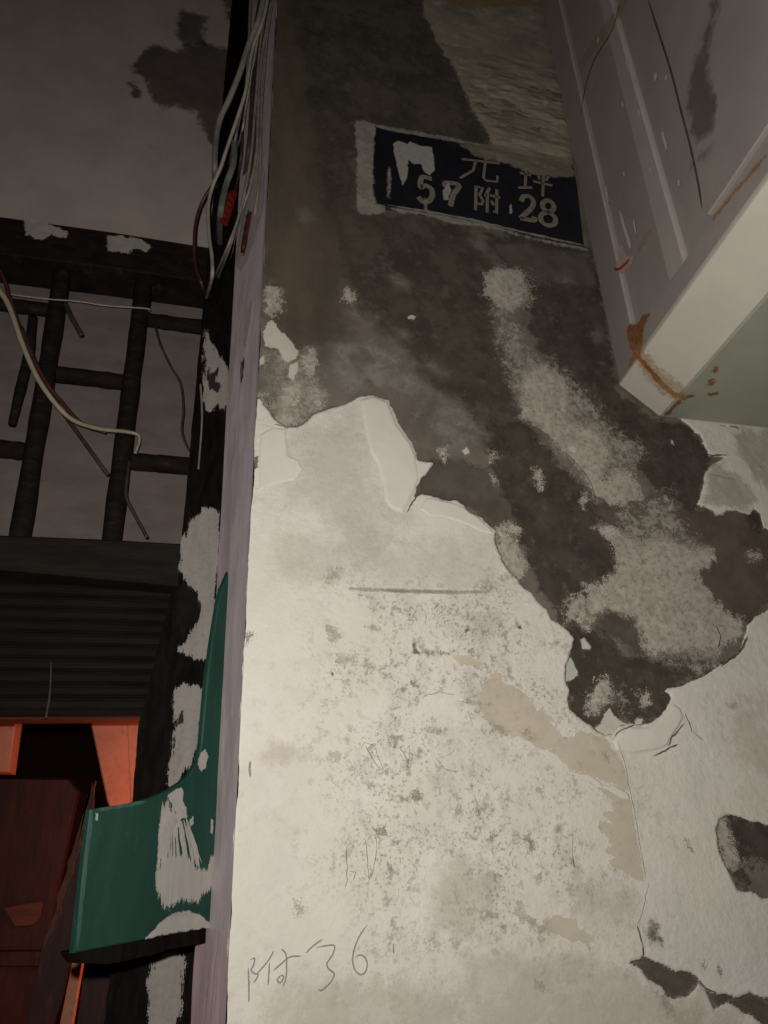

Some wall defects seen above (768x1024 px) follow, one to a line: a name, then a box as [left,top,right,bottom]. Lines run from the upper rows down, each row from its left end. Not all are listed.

leakage [129,12,227,144]
peeling [23,218,68,240]
peeling [106,235,151,254]
leakage [257,0,768,727]
corrosion [626,314,694,415]
peeling [202,77,768,881]
peeling [175,507,220,662]
crack [654,714,704,756]
crack [615,724,649,956]
peeling [716,814,768,899]
peeling [630,956,768,1024]